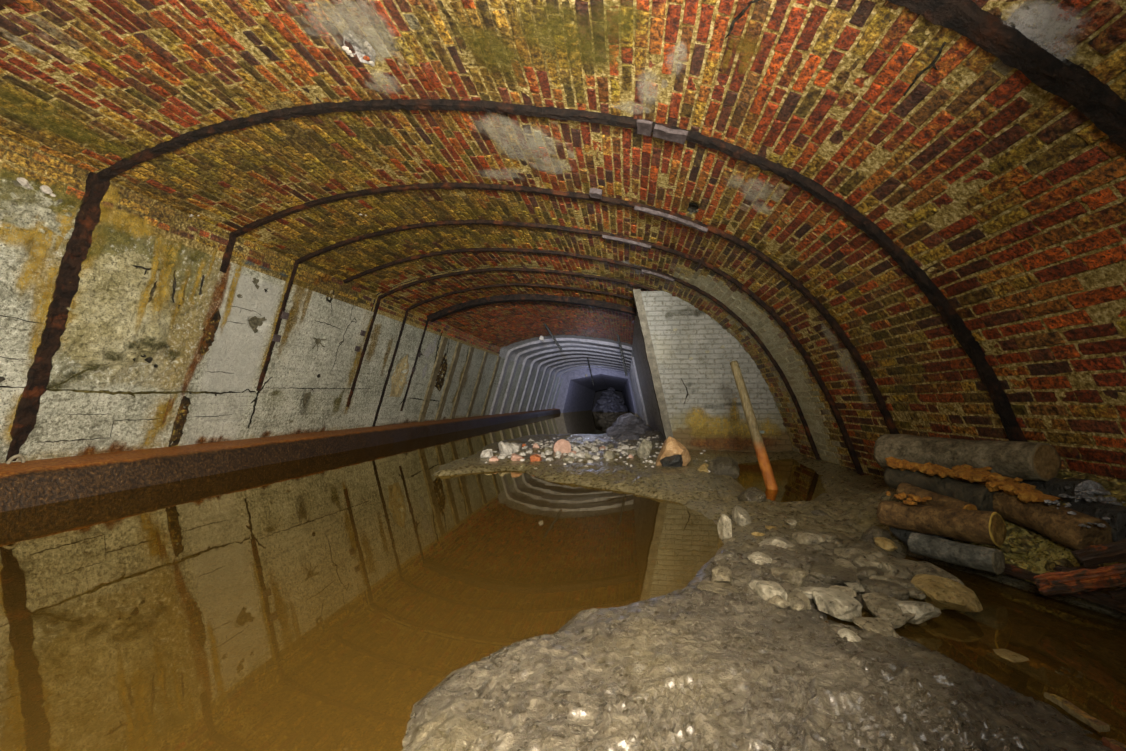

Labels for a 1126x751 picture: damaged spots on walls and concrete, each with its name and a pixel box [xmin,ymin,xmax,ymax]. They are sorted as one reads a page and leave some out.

corrosion [30,289,55,357]
corrosion [81,187,119,269]
water stain [101,205,216,323]
crack [0,300,370,443]